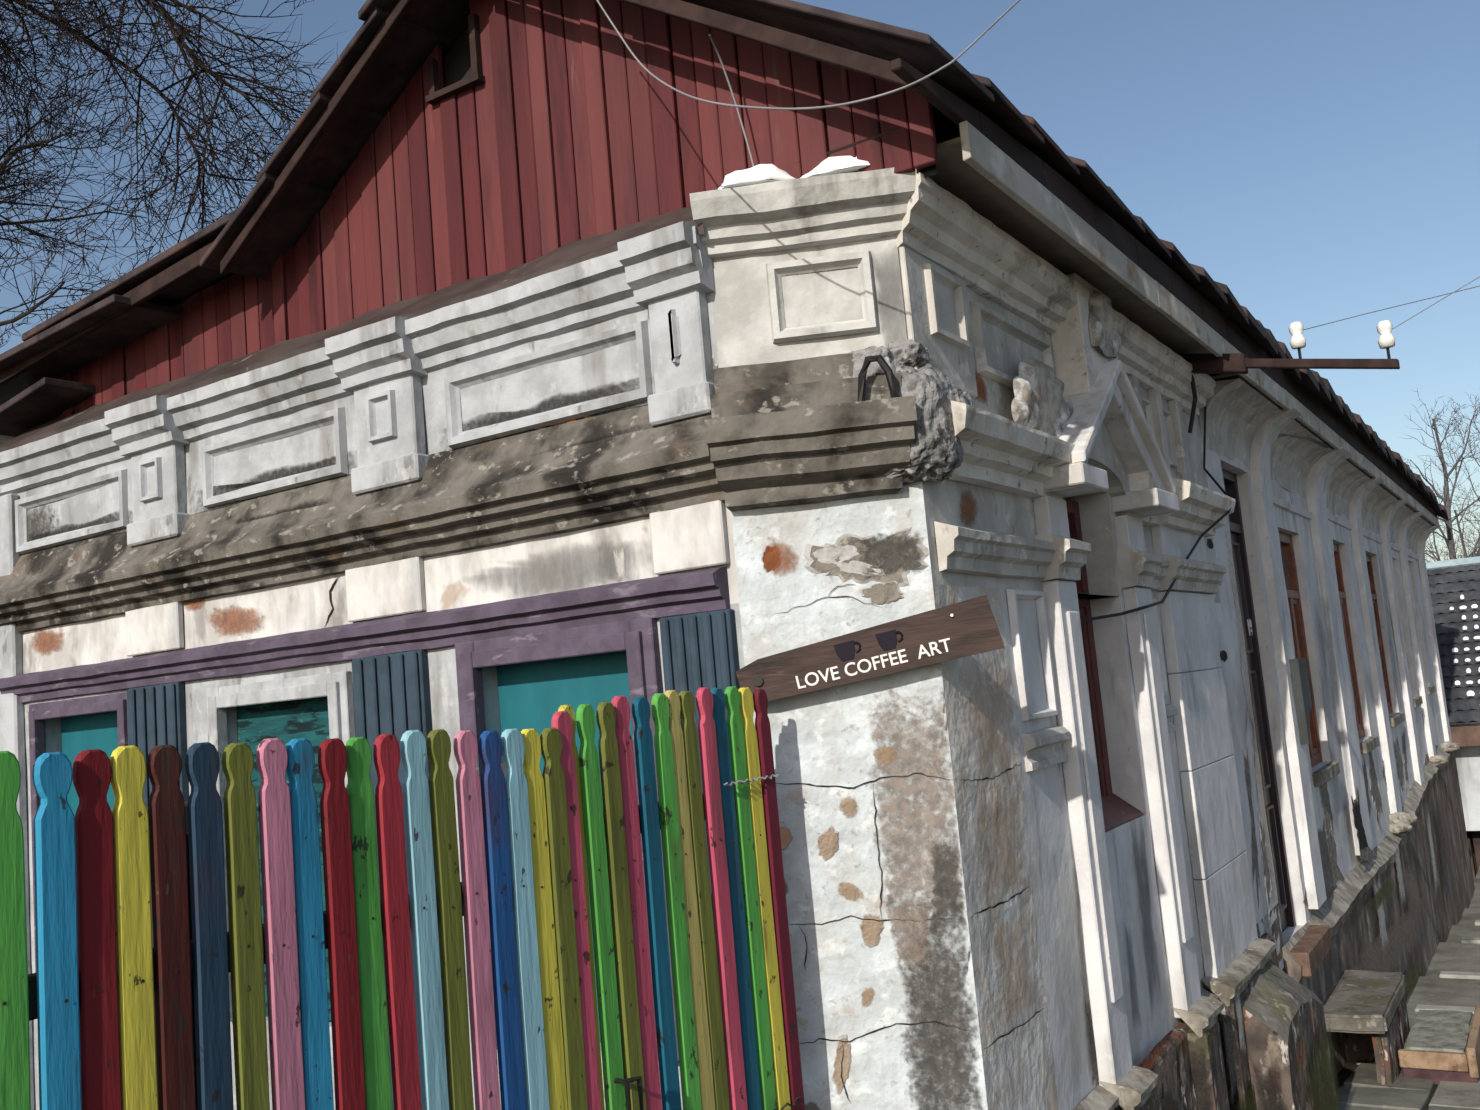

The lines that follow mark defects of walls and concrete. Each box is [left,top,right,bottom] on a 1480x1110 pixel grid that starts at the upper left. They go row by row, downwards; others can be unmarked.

crack [324,577,338,628]
peeling [804,527,929,605]
crack [776,762,1028,970]
leakage [872,695,982,1110]